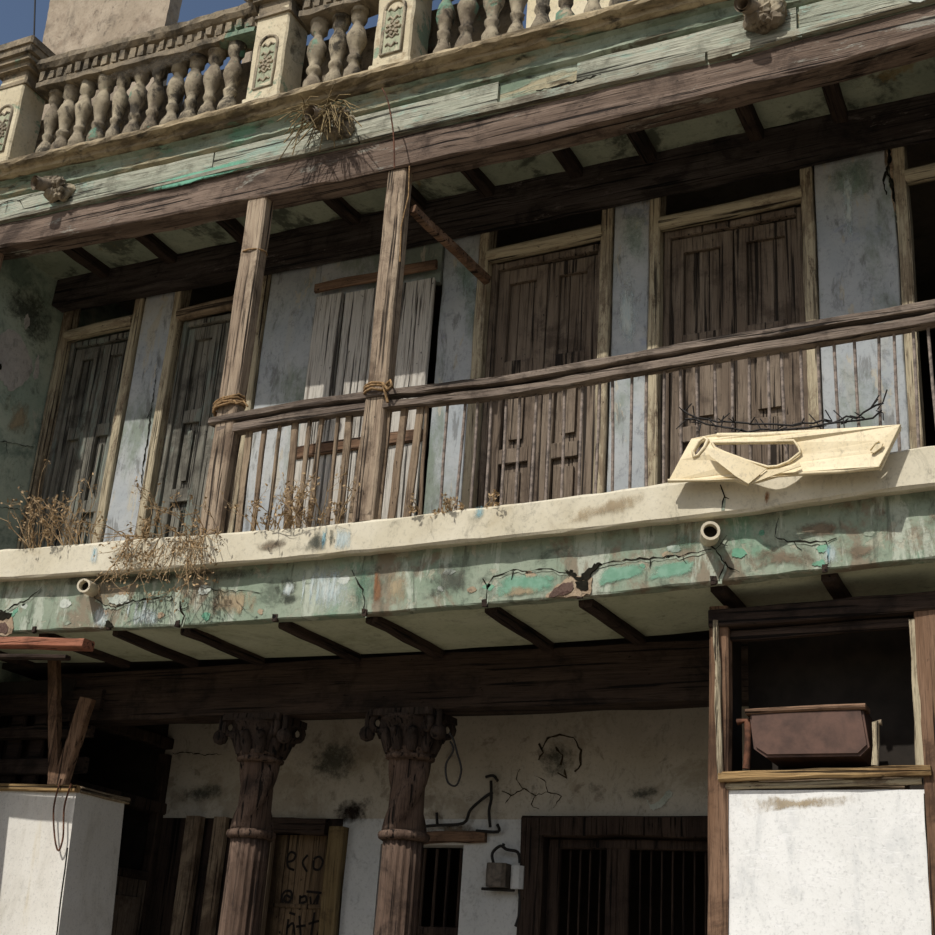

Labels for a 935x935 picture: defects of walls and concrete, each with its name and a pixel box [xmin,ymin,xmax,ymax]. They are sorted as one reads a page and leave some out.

crack [882,149,897,222]
damp [10,289,48,341]
crack [775,518,837,567]
crack [0,587,43,613]
crack [94,587,259,627]
crack [483,568,568,603]
peeling [467,545,693,598]
crack [502,769,562,809]